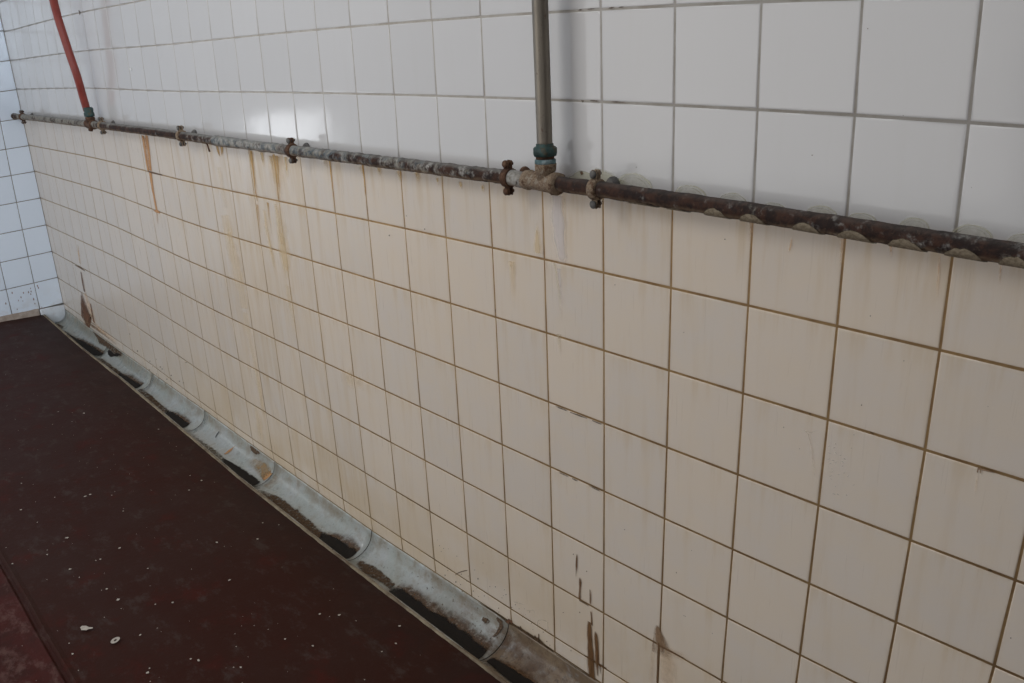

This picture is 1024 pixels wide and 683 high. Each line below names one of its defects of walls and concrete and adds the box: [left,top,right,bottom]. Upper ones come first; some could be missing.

corrosion [142,135,161,213]
corrosion [249,150,279,207]
corrosion [75,253,102,333]
corrosion [576,555,606,680]
corrosion [652,626,683,683]